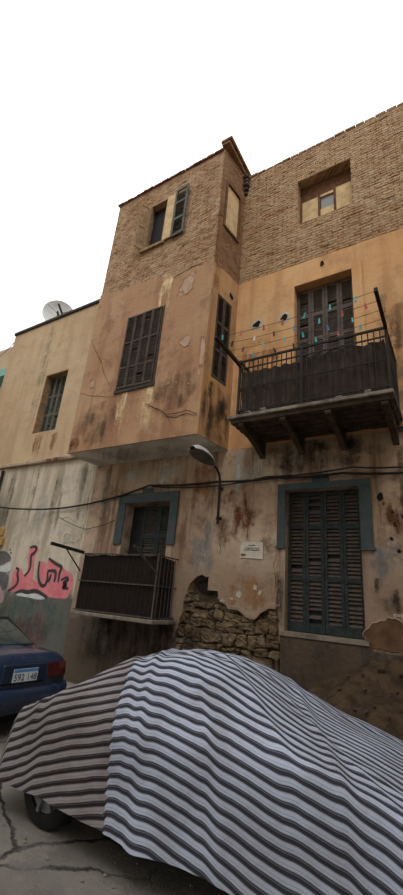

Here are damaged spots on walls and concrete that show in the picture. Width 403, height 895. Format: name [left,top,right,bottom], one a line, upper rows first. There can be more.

leakage [115,392,128,422]
leakage [141,381,153,425]
rust [229,491,253,537]
flaking render [175,577,280,673]
flaking render [362,613,403,653]